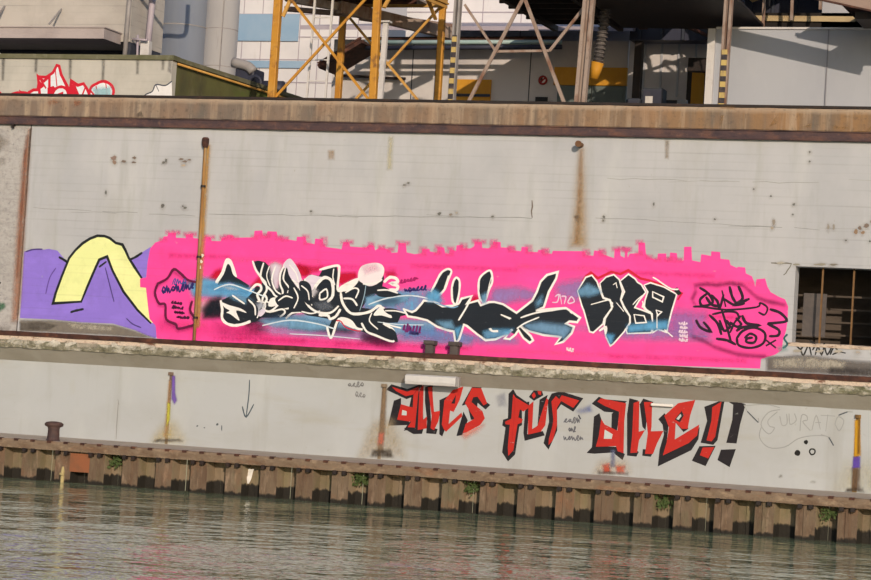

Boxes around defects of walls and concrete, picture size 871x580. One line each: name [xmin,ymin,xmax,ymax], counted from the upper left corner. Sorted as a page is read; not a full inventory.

rust [197,145,209,327]